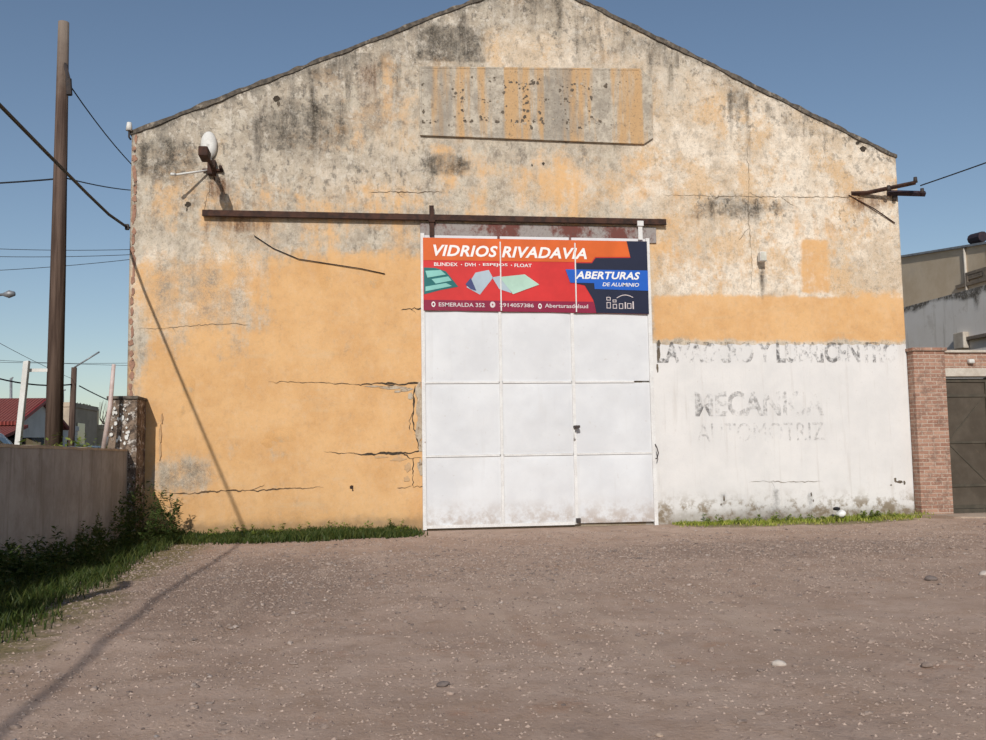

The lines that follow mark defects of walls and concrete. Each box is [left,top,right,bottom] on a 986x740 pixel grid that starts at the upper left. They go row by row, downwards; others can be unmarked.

crack [279,381,422,489]
crack [168,485,315,507]